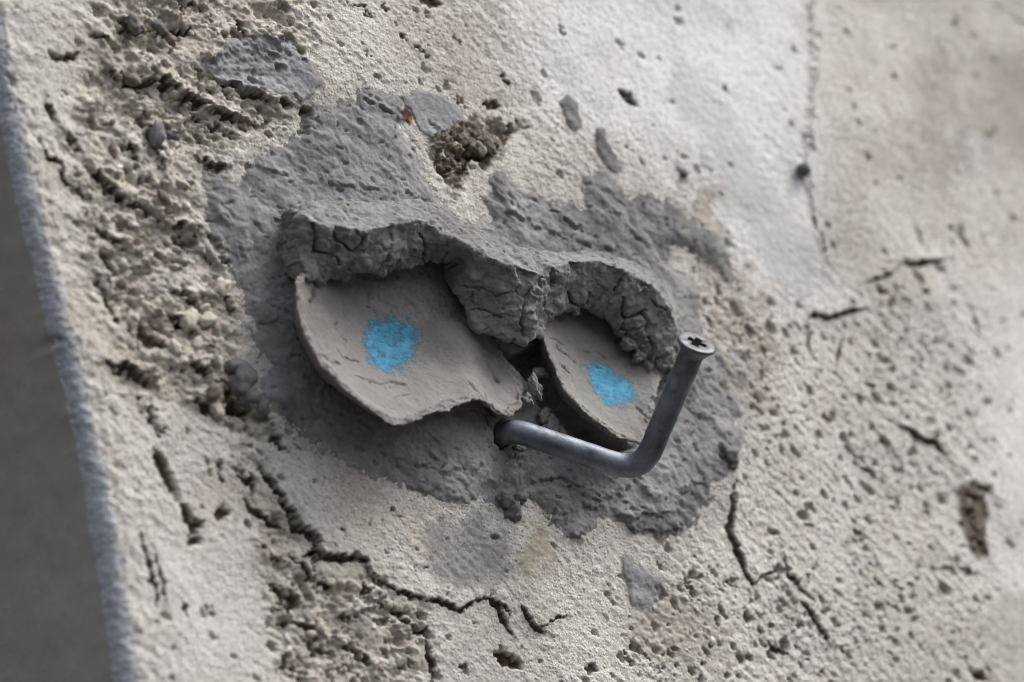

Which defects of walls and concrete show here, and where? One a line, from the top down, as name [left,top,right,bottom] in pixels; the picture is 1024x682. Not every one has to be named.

flaking render [44,0,300,450]
flaking render [433,95,517,184]
flaking render [695,185,730,244]
flaking render [705,262,779,413]
crack [805,214,943,366]
crack [139,532,167,607]
crack [245,478,567,635]
crack [724,480,832,648]